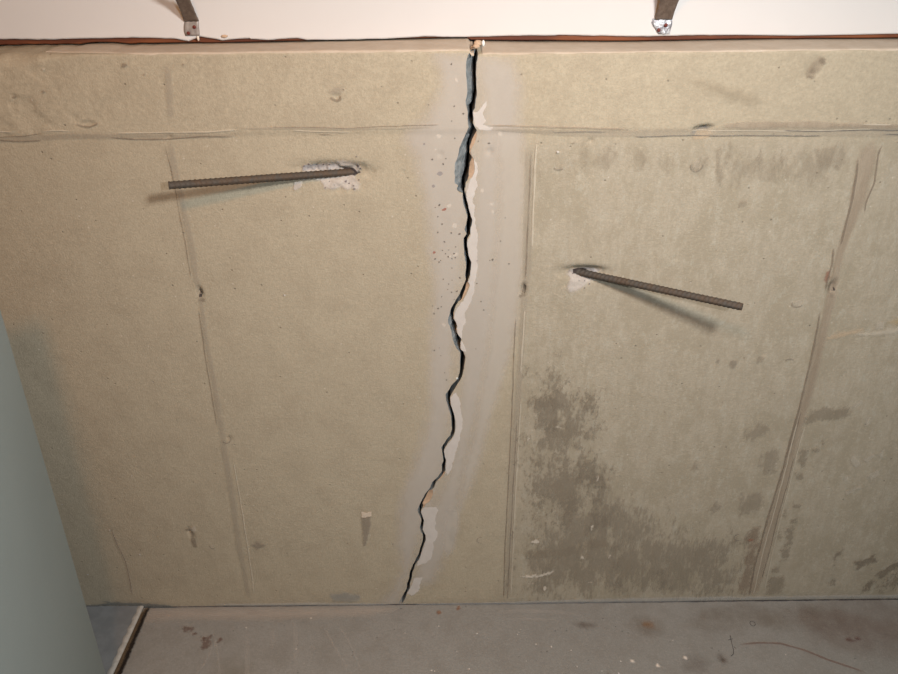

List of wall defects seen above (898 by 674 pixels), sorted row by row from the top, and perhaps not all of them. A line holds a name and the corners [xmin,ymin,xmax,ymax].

peeling [417,507,438,566]
crack [402,40,485,603]
peeling [444,393,463,475]
leakage [516,367,760,602]